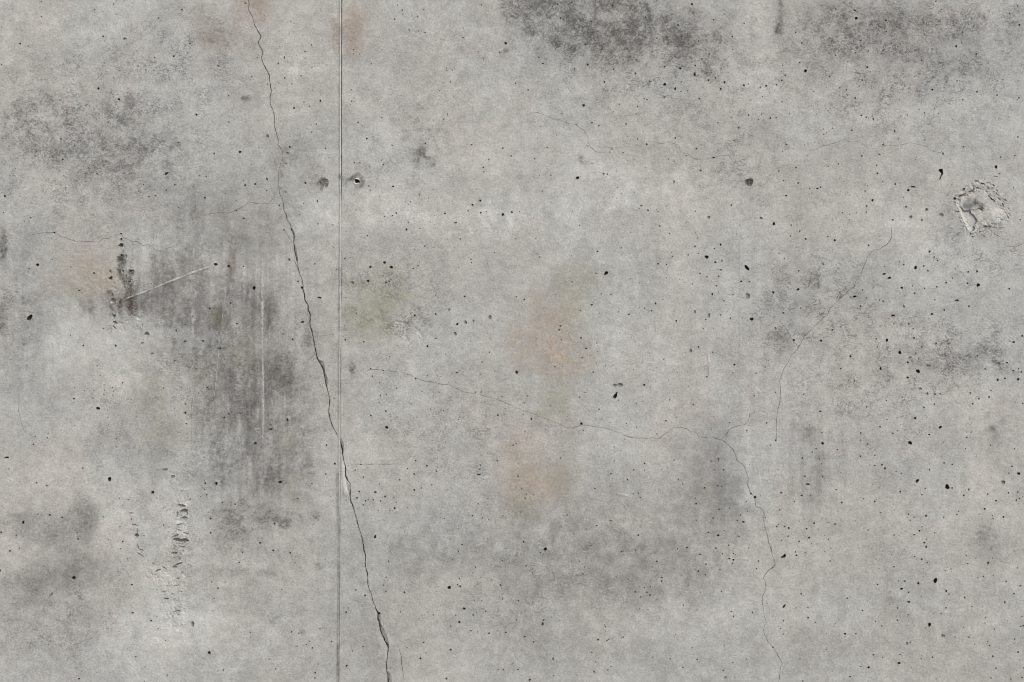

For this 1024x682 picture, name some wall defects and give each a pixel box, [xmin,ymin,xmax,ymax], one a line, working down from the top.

crack [212,0,404,682]
crack [367,229,892,682]
spalling [952,172,1013,240]